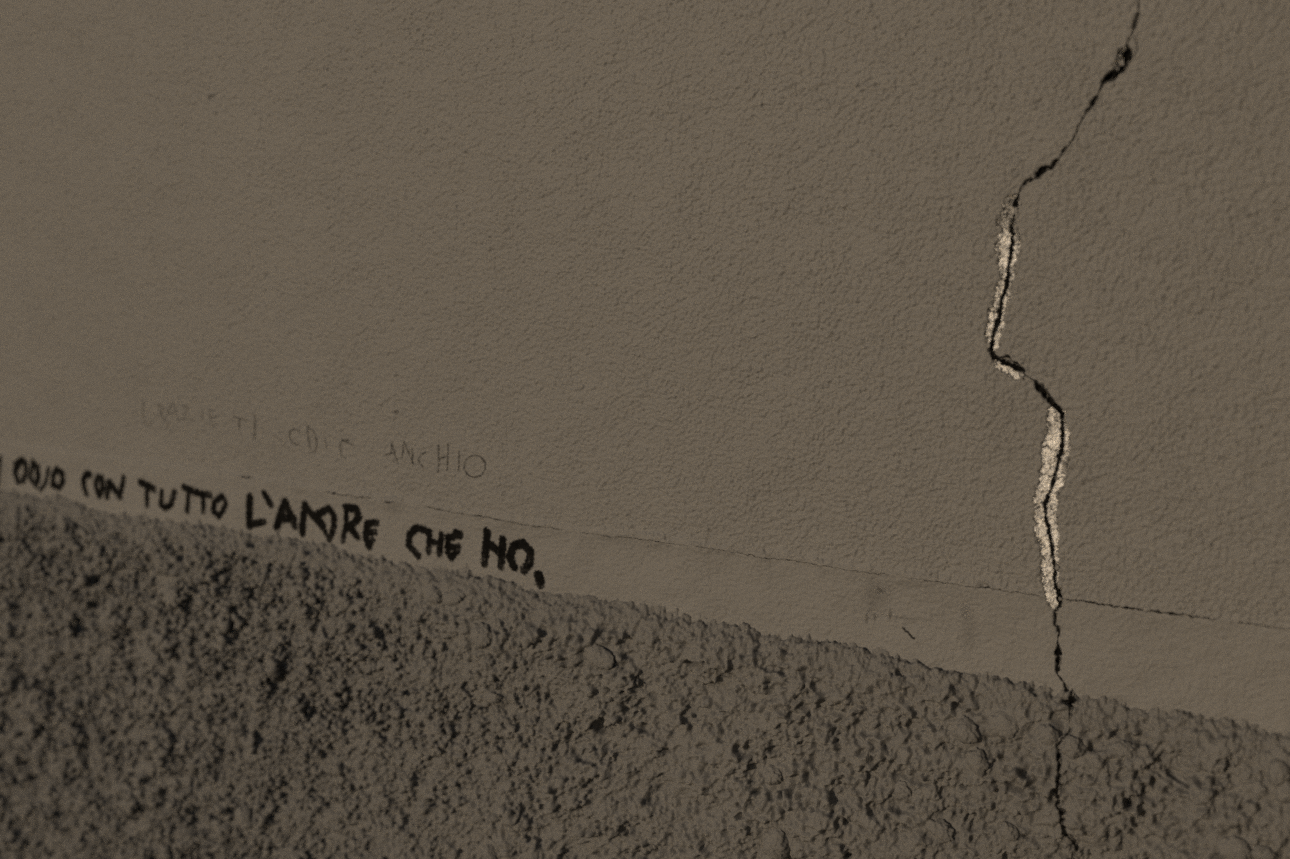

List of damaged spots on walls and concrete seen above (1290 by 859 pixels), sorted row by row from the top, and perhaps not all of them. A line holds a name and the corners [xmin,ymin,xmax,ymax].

crack [326,0,1290,859]